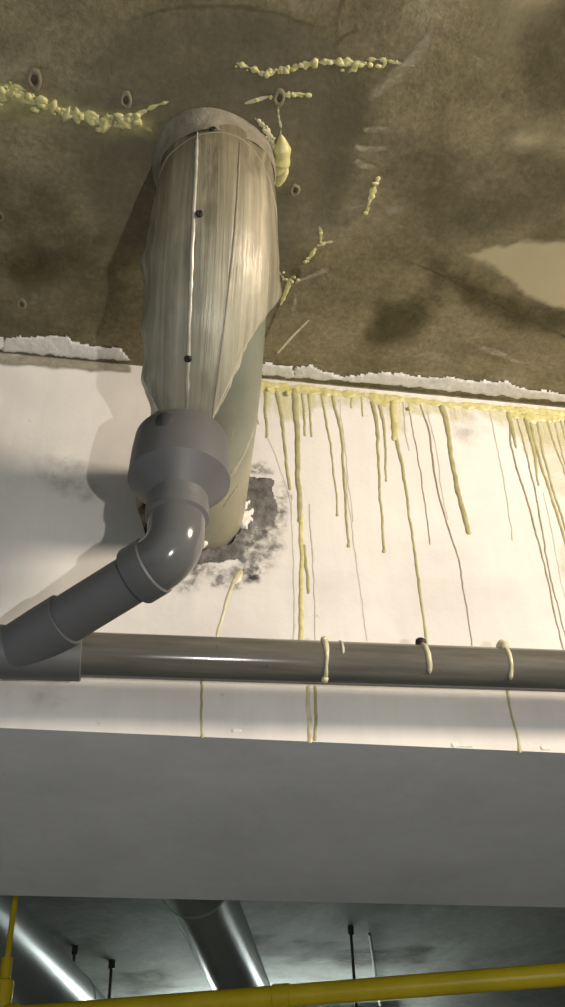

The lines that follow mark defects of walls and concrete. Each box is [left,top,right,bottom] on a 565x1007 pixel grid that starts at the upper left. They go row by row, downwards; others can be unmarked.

leakage [509,128,565,152]
peeling [0,335,130,372]
leakage [368,301,426,343]
peeling [261,362,565,408]
leakage [438,264,565,328]
peeling [467,240,565,309]
leakage [257,380,565,678]
leakage [216,569,244,637]
leakage [306,685,318,743]
leakage [504,647,522,753]